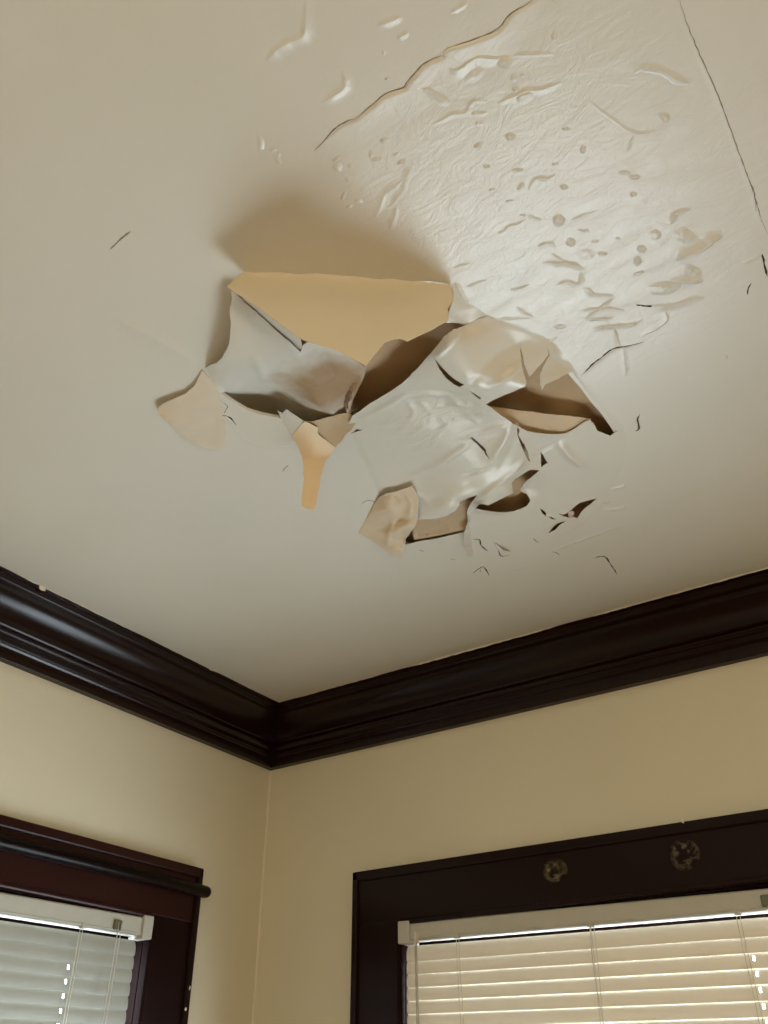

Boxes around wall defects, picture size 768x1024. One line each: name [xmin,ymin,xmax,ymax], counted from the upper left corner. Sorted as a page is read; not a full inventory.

crack [675,0,768,294]
peeling [157,272,627,557]
crack [454,539,508,577]
crack [593,556,617,575]